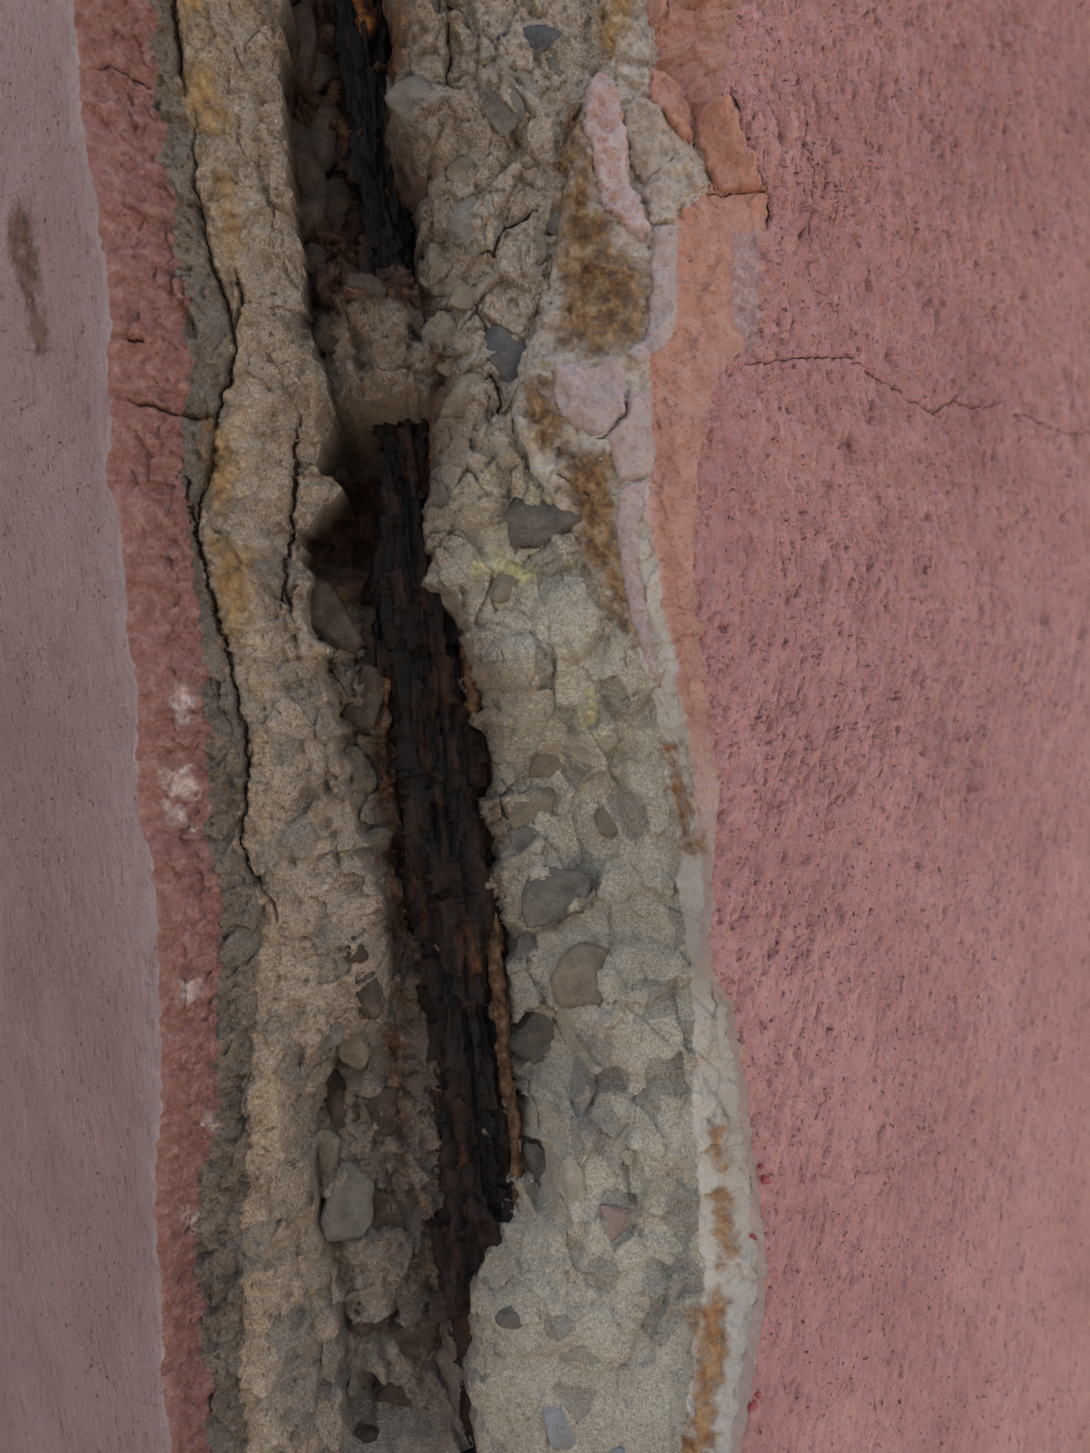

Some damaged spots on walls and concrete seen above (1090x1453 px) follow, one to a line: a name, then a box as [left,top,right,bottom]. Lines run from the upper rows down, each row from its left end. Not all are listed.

crack [97,0,186,95]
corrosion [352,0,408,85]
corrosion [555,102,649,354]
crack [130,130,278,917]
corrosion [523,377,640,645]
crack [745,356,1089,436]
corrosion [375,677,407,1000]
spalling [73,0,769,1453]
corrosion [457,627,483,717]
corrosion [486,913,526,1207]
corrosion [706,1125,737,1269]
corrosion [681,1289,730,1453]